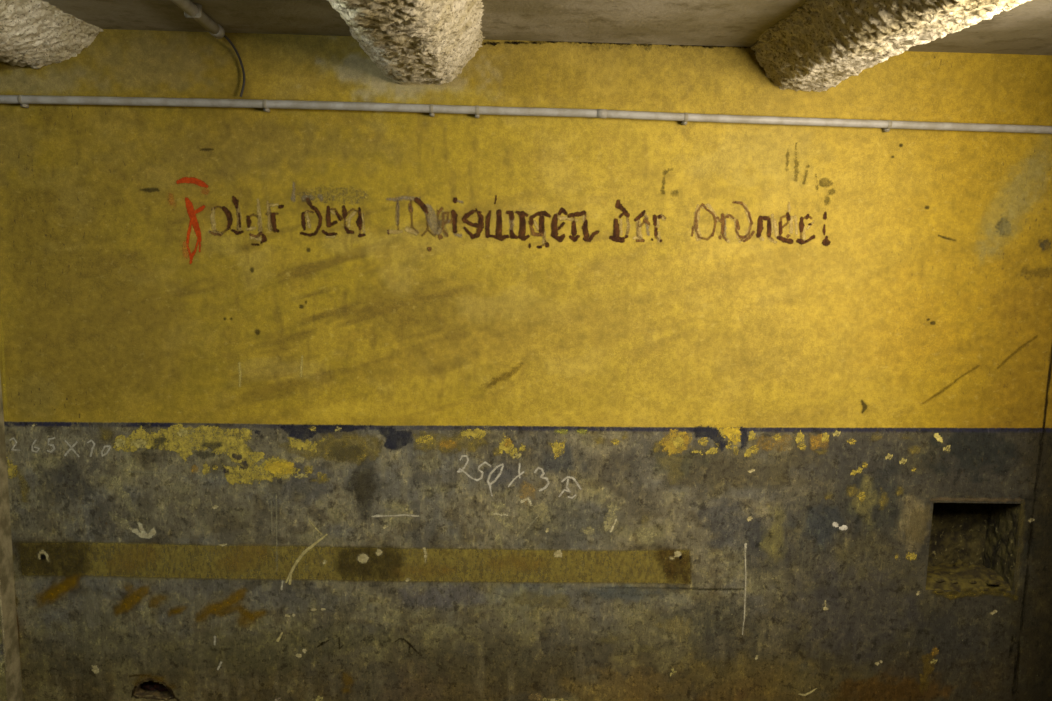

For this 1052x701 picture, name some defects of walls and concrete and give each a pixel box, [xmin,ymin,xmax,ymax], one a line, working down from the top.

peeling [102,422,526,485]
peeling [654,424,855,483]
spalling [130,674,180,701]